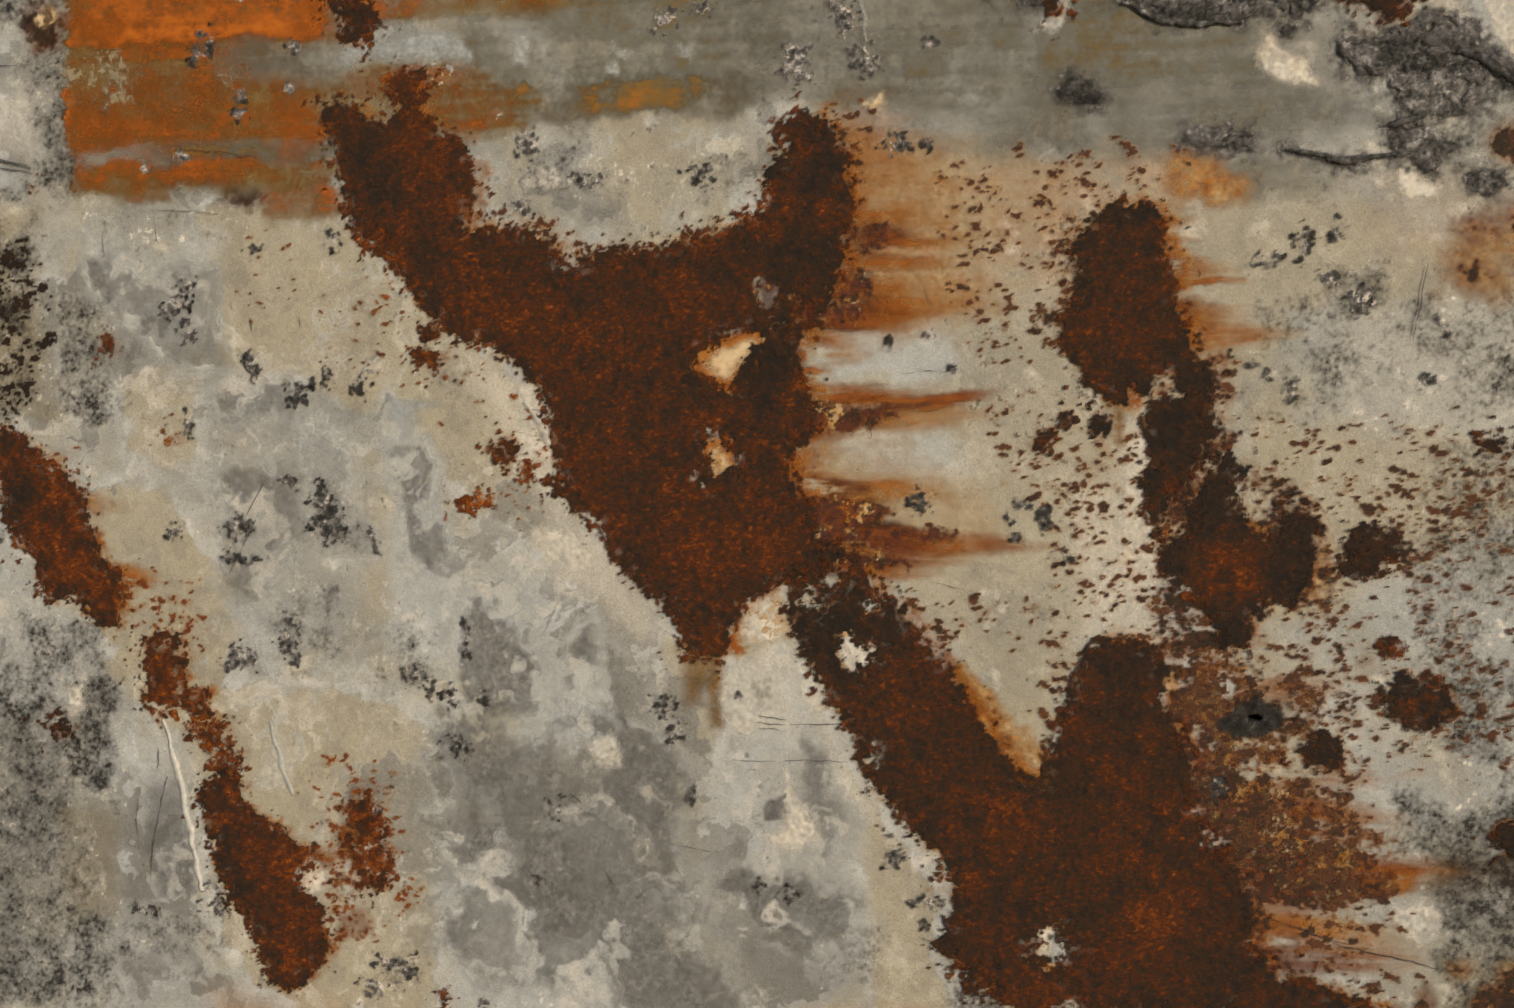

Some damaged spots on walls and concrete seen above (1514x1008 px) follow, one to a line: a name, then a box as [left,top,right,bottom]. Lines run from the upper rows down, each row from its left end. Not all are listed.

rust [1324,0,1428,42]
rust [935,166,1010,266]
rust [1029,149,1092,219]
rust [977,283,1033,364]
rust [1290,428,1341,464]
rust [1048,445,1114,546]
rust [0,236,422,994]
rust [969,593,996,633]
rust [1039,630,1068,648]
rust [1408,589,1510,688]
rust [1476,715,1514,743]
rust [433,985,459,1008]